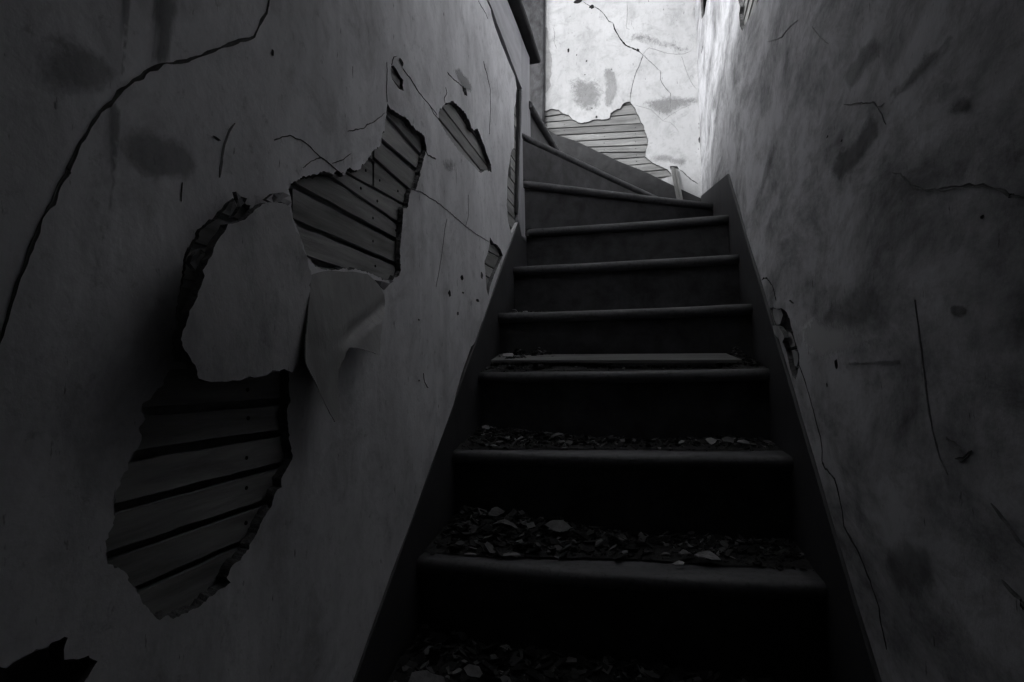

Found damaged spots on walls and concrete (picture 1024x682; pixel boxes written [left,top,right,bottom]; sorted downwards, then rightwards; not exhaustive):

crack [0,0,270,343]
flaking render [288,104,427,280]
crack [274,56,463,174]
flaking render [391,58,404,91]
flaking render [438,71,491,173]
leakage [574,70,616,106]
flaking render [545,102,679,180]
crack [584,2,695,128]
crack [892,172,1024,199]
flaking render [476,238,503,302]
flaking render [105,198,293,620]
crack [914,300,972,475]